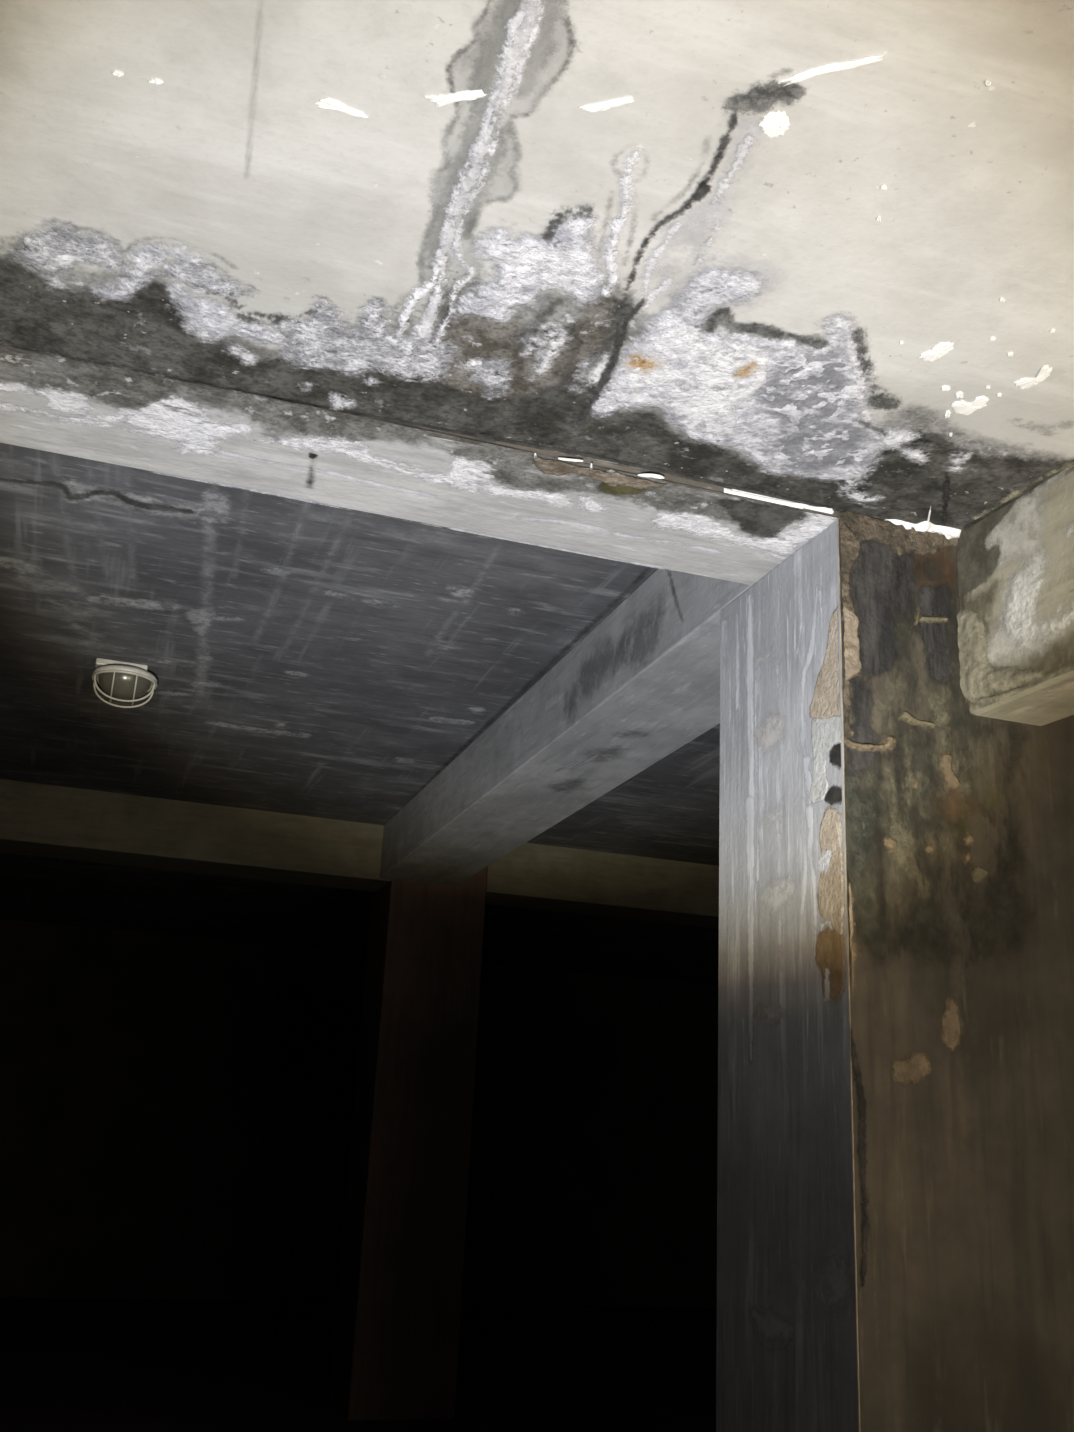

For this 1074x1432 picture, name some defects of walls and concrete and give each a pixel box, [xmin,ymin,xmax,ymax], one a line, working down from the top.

crack [13,479,231,523]
damp [0,0,1074,960]
crack [576,80,805,427]
spalling [809,511,960,1001]